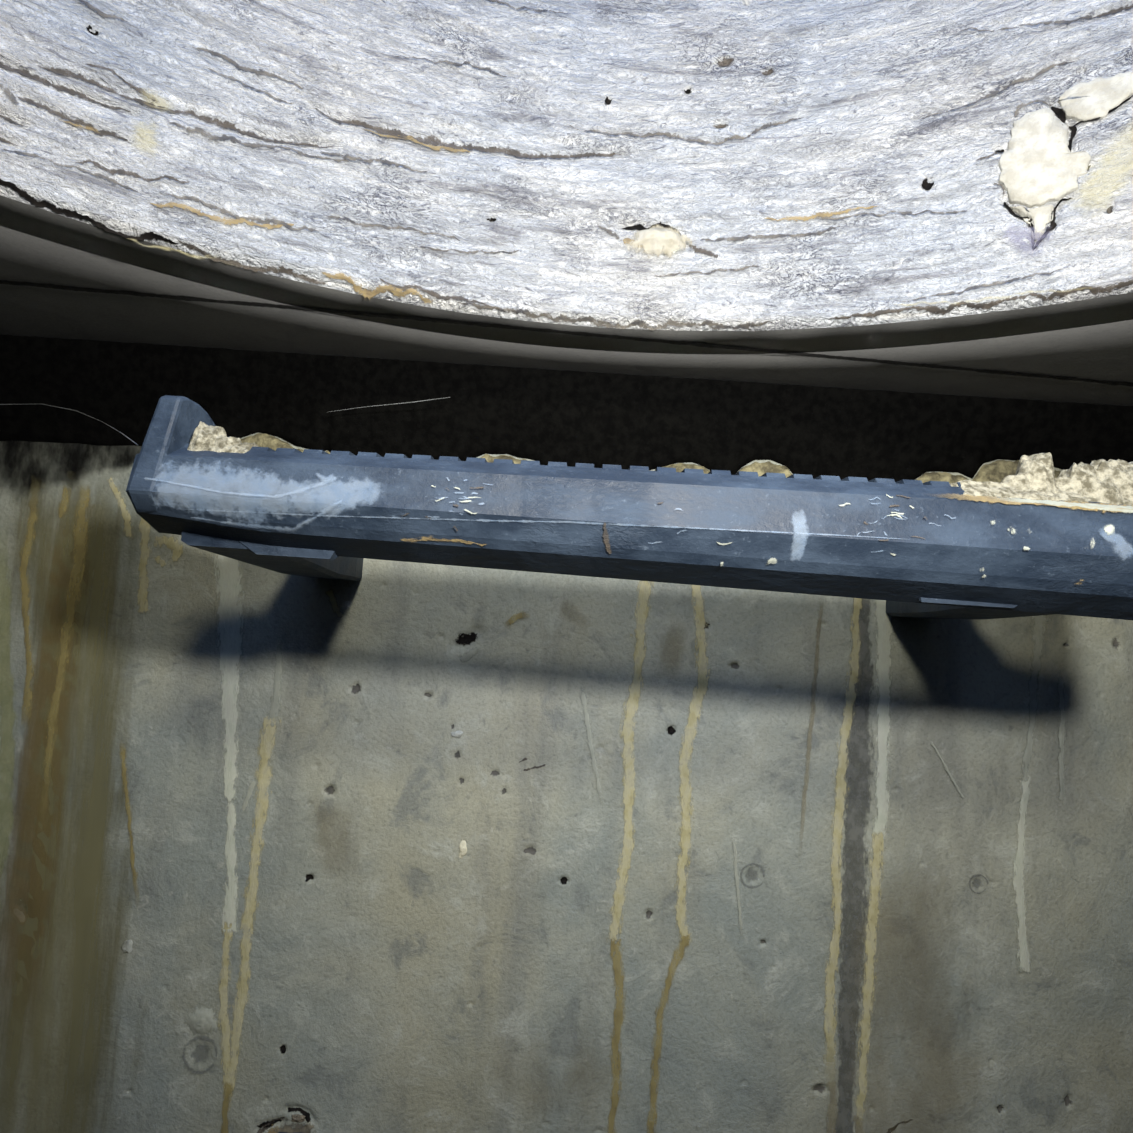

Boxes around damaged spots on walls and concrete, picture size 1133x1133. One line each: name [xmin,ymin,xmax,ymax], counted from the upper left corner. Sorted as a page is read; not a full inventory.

spalling [0,179,774,330]
spalling [830,280,1133,319]
rust [0,487,124,1133]
spalling [257,1107,316,1133]